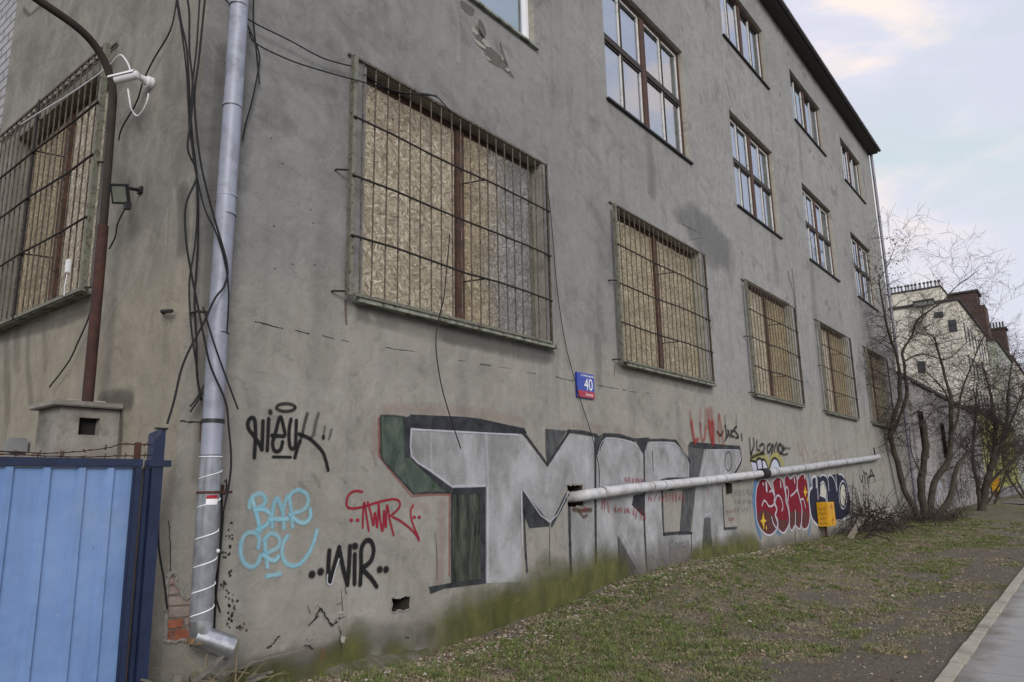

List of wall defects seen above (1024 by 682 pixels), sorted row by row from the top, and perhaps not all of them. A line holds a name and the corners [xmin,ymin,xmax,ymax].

flaking render [461,1,513,77]
flaking render [162,571,191,644]
crack [303,588,347,650]